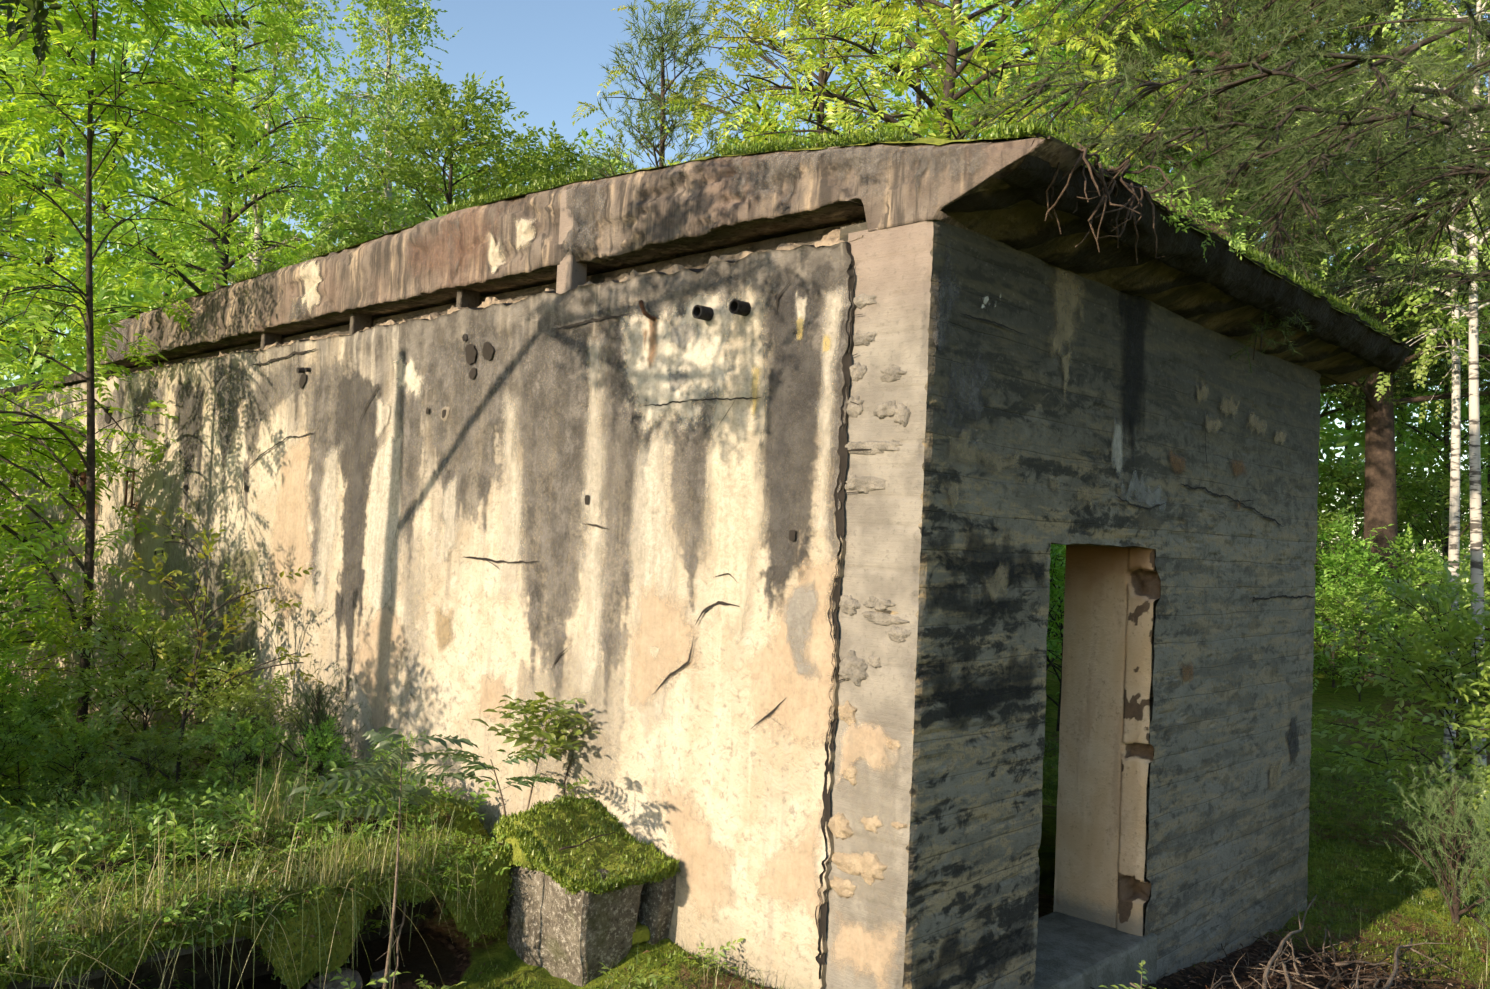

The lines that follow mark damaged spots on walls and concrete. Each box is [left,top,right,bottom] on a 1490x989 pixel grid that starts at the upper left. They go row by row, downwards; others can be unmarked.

leakage [1113,291,1166,510]
leakage [97,260,851,780]
crack [466,556,538,570]
crack [652,573,739,695]
crack [751,698,786,729]
crack [815,261,871,979]